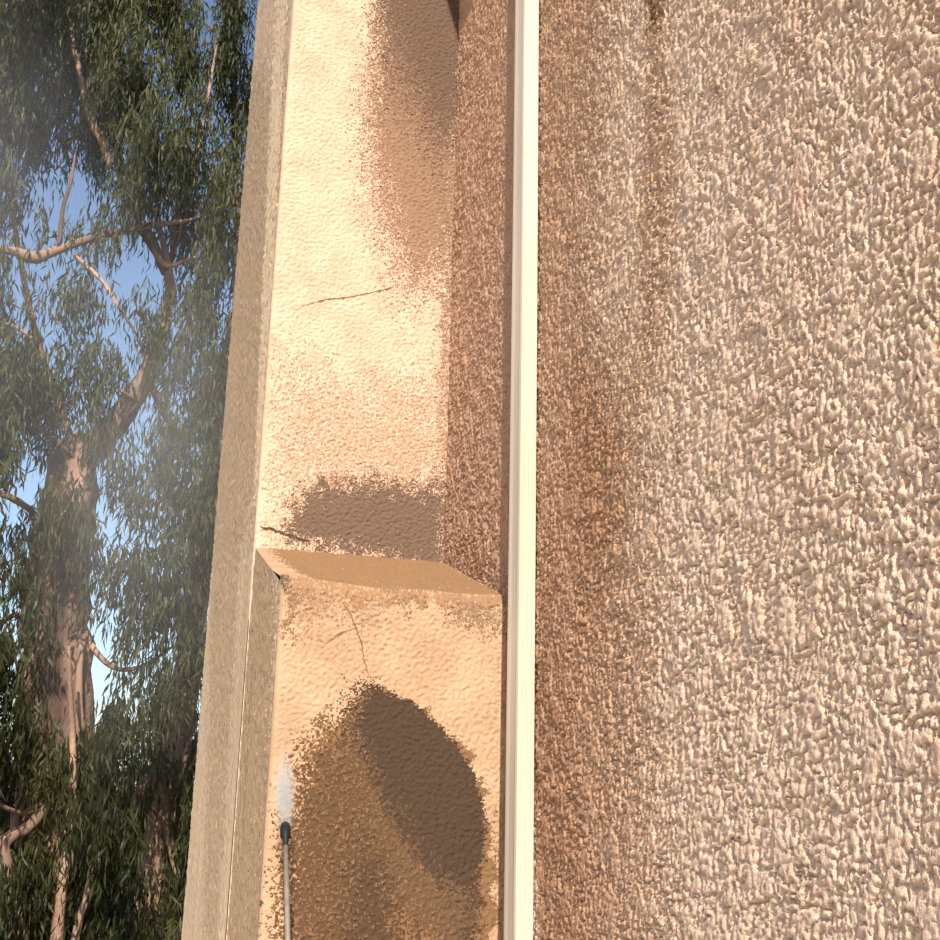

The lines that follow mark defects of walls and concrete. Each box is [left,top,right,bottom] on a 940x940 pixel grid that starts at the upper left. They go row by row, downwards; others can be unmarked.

leakage [533,810,541,940]